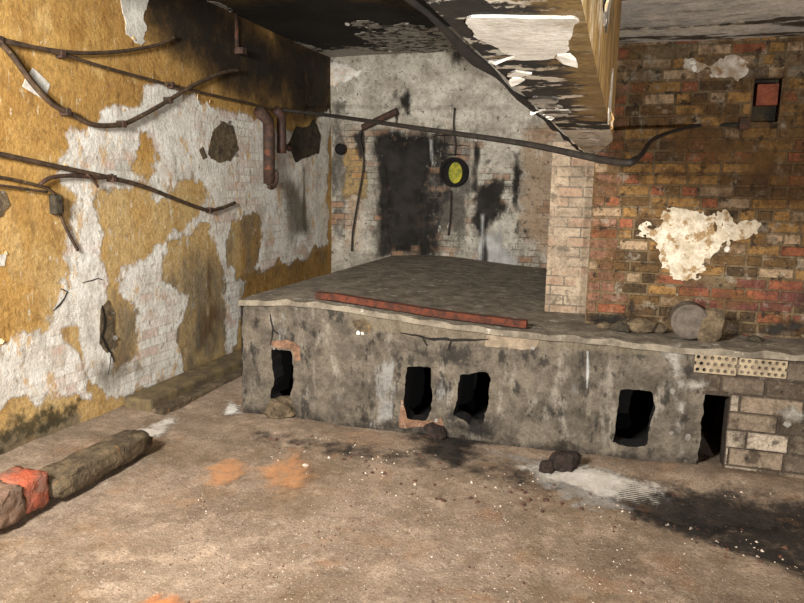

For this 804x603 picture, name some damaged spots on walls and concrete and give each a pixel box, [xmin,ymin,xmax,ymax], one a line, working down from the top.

peeling [345,20,456,53]
peeling [463,14,579,68]
peeling [603,0,612,33]
peeling [330,59,367,87]
peeling [507,70,532,87]
peeling [528,96,573,120]
peeling [340,142,368,199]
leakage [380,166,391,256]
peeling [0,83,331,411]
leakage [478,215,517,265]
flaking render [637,207,761,281]
flaking render [352,318,373,335]